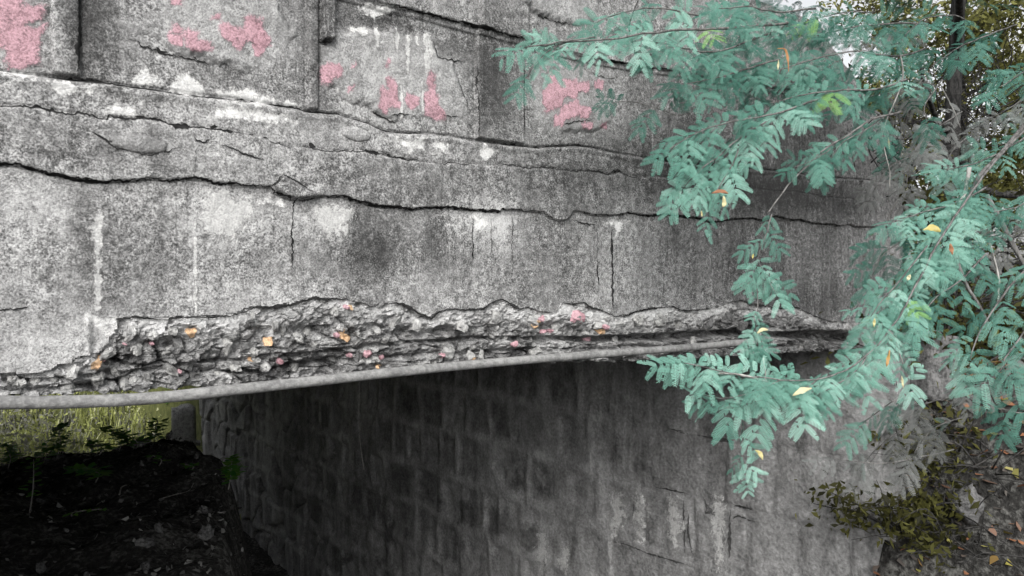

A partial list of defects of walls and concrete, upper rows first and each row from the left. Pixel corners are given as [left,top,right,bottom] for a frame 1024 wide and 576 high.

crack [0,0,885,322]
leakage [84,213,117,336]
spalling [0,298,903,396]